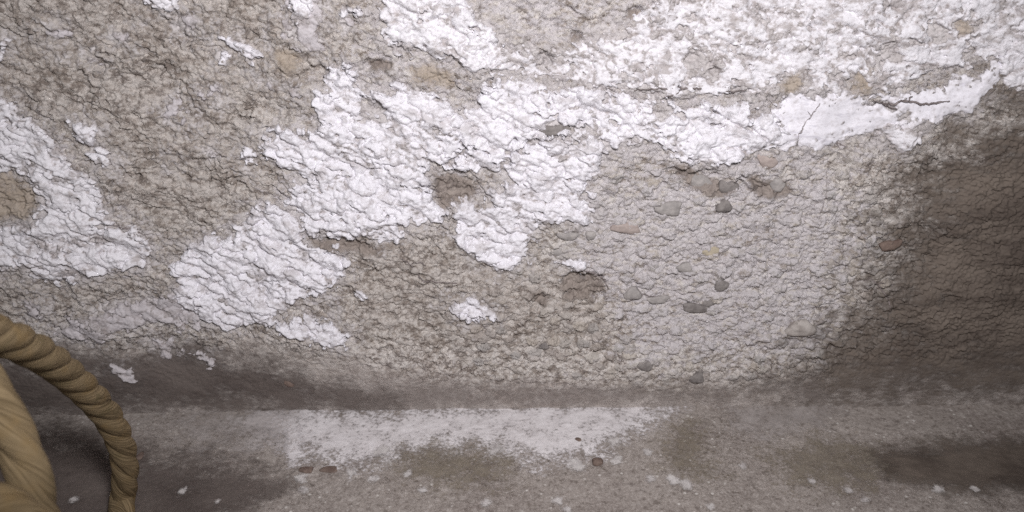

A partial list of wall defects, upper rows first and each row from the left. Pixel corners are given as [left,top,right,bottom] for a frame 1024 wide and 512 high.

crack [797,103,820,145]
crack [873,96,950,109]
damp [20,0,1024,413]
damp [0,360,81,415]
damp [874,437,1024,494]